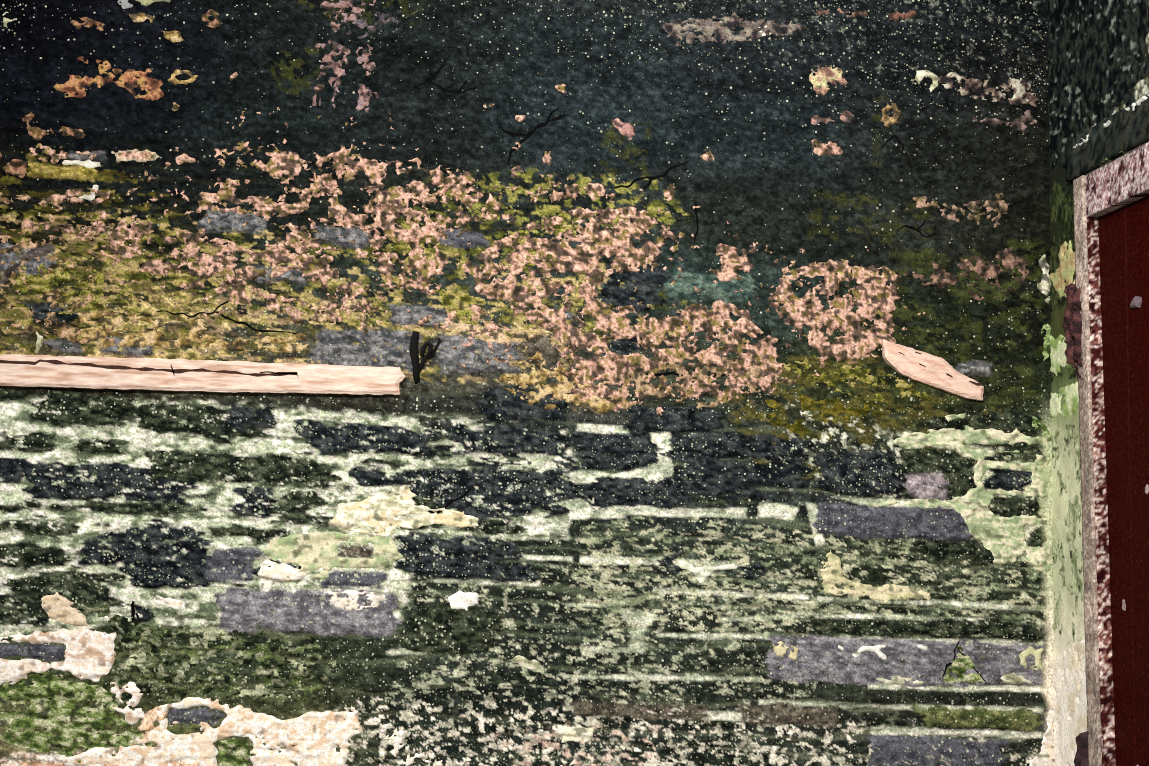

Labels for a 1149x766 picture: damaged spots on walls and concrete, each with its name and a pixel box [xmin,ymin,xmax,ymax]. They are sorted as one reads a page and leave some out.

peeling [70,17,105,31]
peeling [118,0,170,23]
peeling [201,9,222,28]
peeling [163,31,184,43]
peeling [312,0,409,126]
peeling [0,111,1075,416]
peeling [1049,334,1079,419]
peeling [507,655,542,670]
peeling [0,590,485,766]